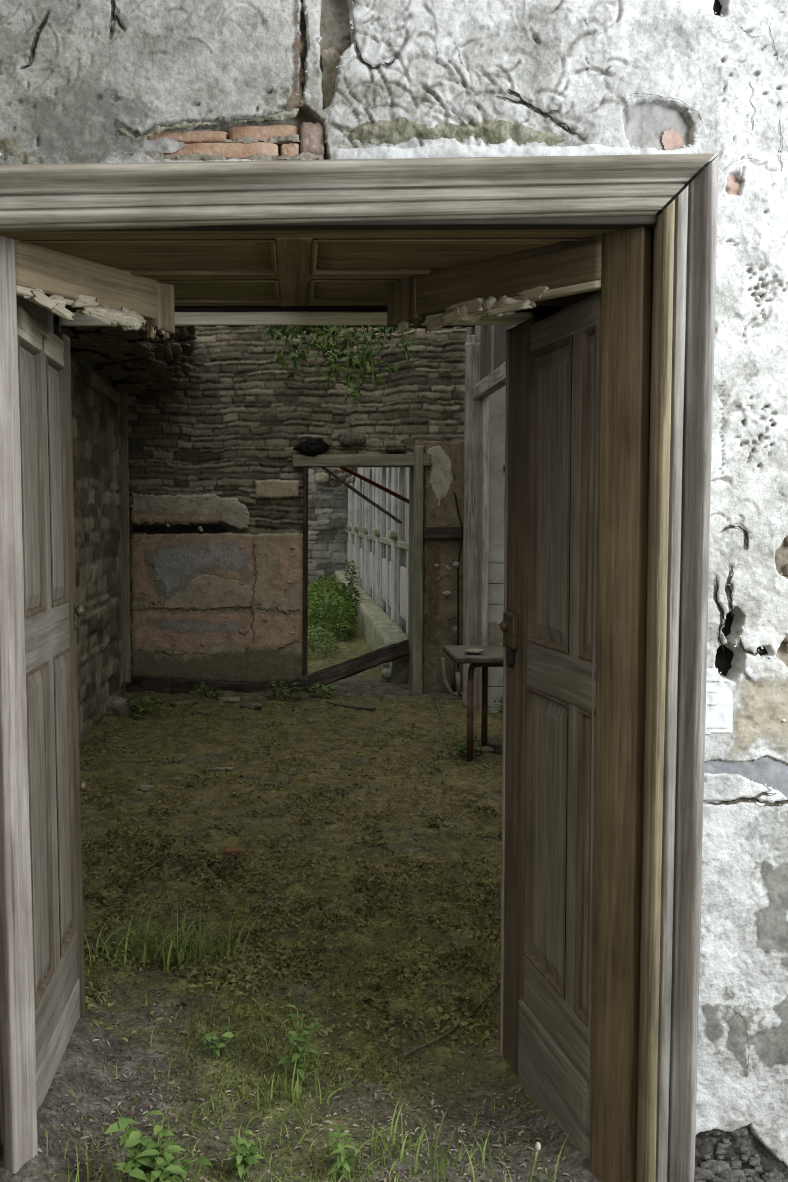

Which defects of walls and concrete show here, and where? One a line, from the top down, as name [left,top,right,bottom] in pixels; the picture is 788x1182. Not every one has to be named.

crack [354,40,397,69]
flaking render [109,92,329,161]
crack [497,89,584,140]
spalling [715,584,744,676]
crack [703,792,788,806]